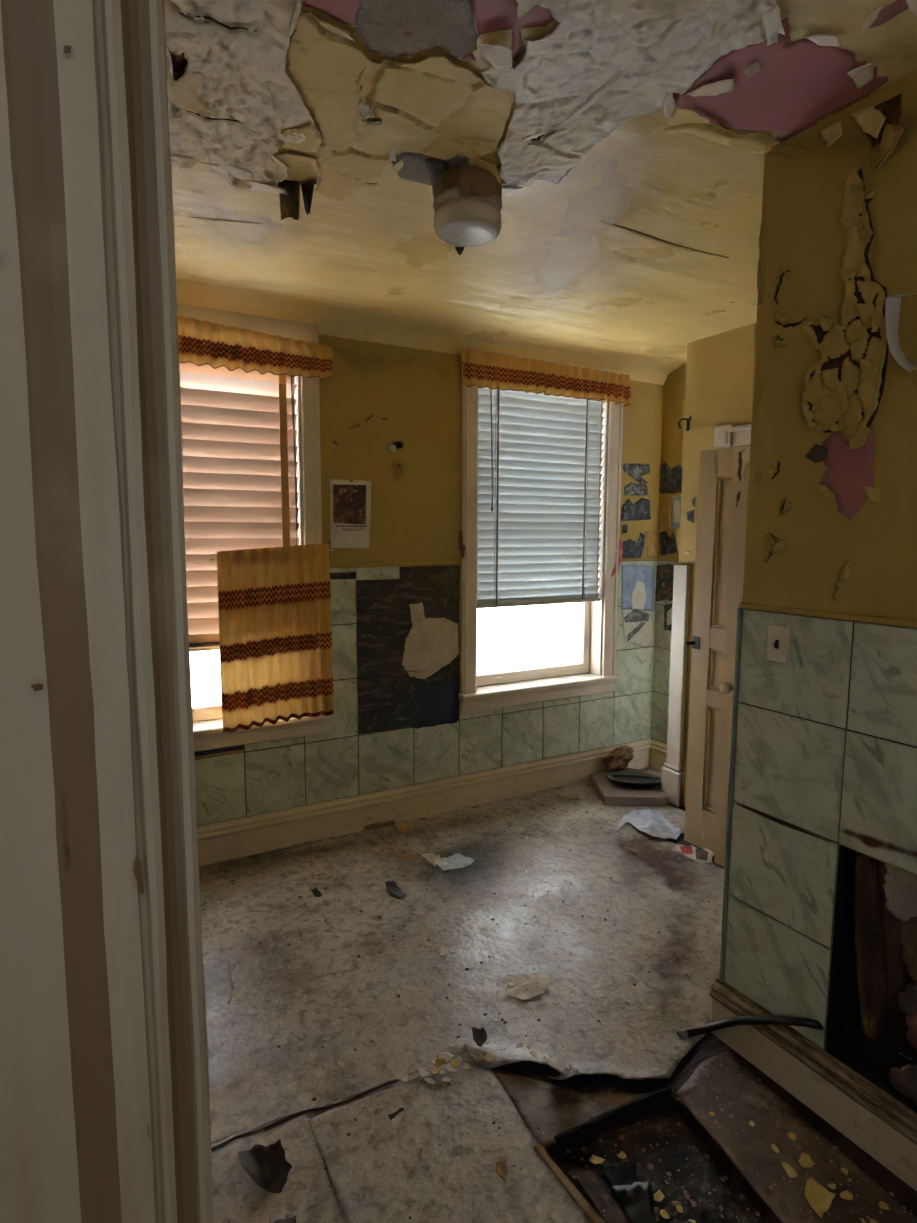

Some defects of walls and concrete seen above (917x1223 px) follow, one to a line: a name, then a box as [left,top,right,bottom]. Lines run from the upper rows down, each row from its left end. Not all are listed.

peeling [164,0,917,521]
crack [593,219,729,259]
crack [757,212,807,348]
peeling [356,531,465,735]
spalling [842,851,917,1104]
crack [211,1078,399,1149]
peeling [805,1177,836,1218]